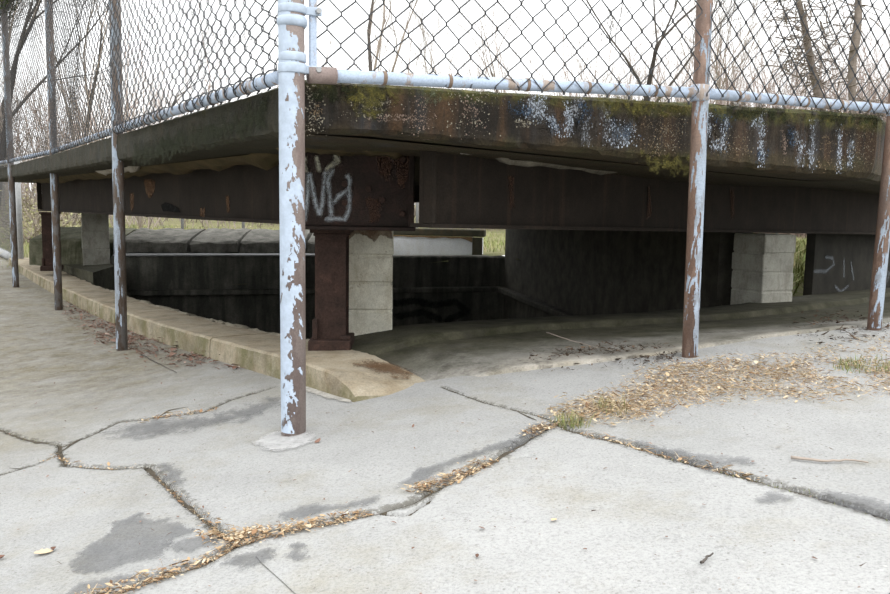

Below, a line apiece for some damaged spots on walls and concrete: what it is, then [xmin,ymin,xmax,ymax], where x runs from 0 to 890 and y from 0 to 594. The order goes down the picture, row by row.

peeling [32,0,351,434]
leakage [305,85,328,136]
leakage [341,89,505,140]
crack [0,387,890,594]